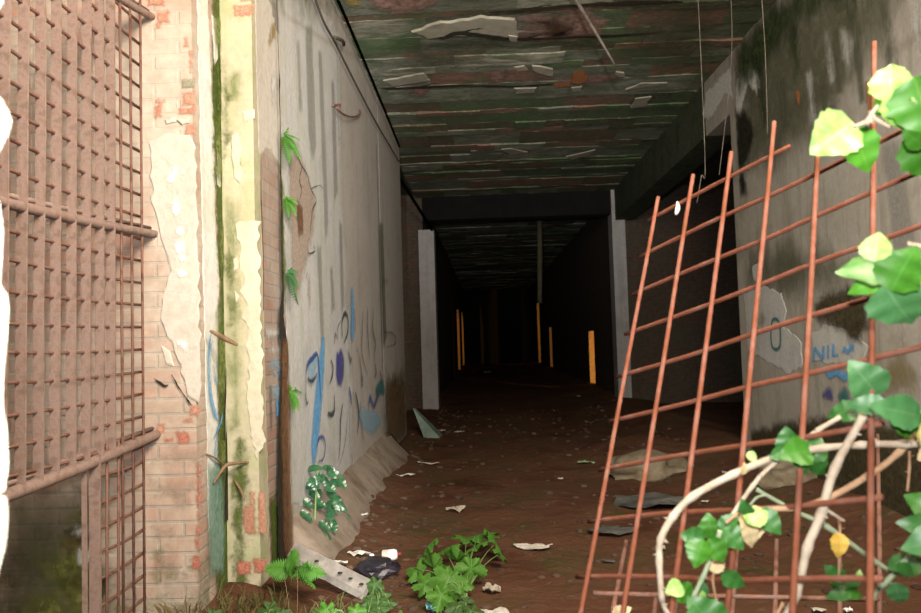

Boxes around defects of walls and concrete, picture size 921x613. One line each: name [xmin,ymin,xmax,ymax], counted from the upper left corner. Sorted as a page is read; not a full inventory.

flaking render [411,8,610,42]
water stain [214,60,222,114]
peeling [383,73,430,95]
spalling [514,65,625,92]
peeling [625,82,667,109]
water stain [702,0,884,164]
spalling [871,95,902,144]
flaking render [148,0,221,569]
flaking render [233,0,353,577]
water stain [749,248,836,293]
water stain [217,309,226,394]
spalling [575,120,921,613]